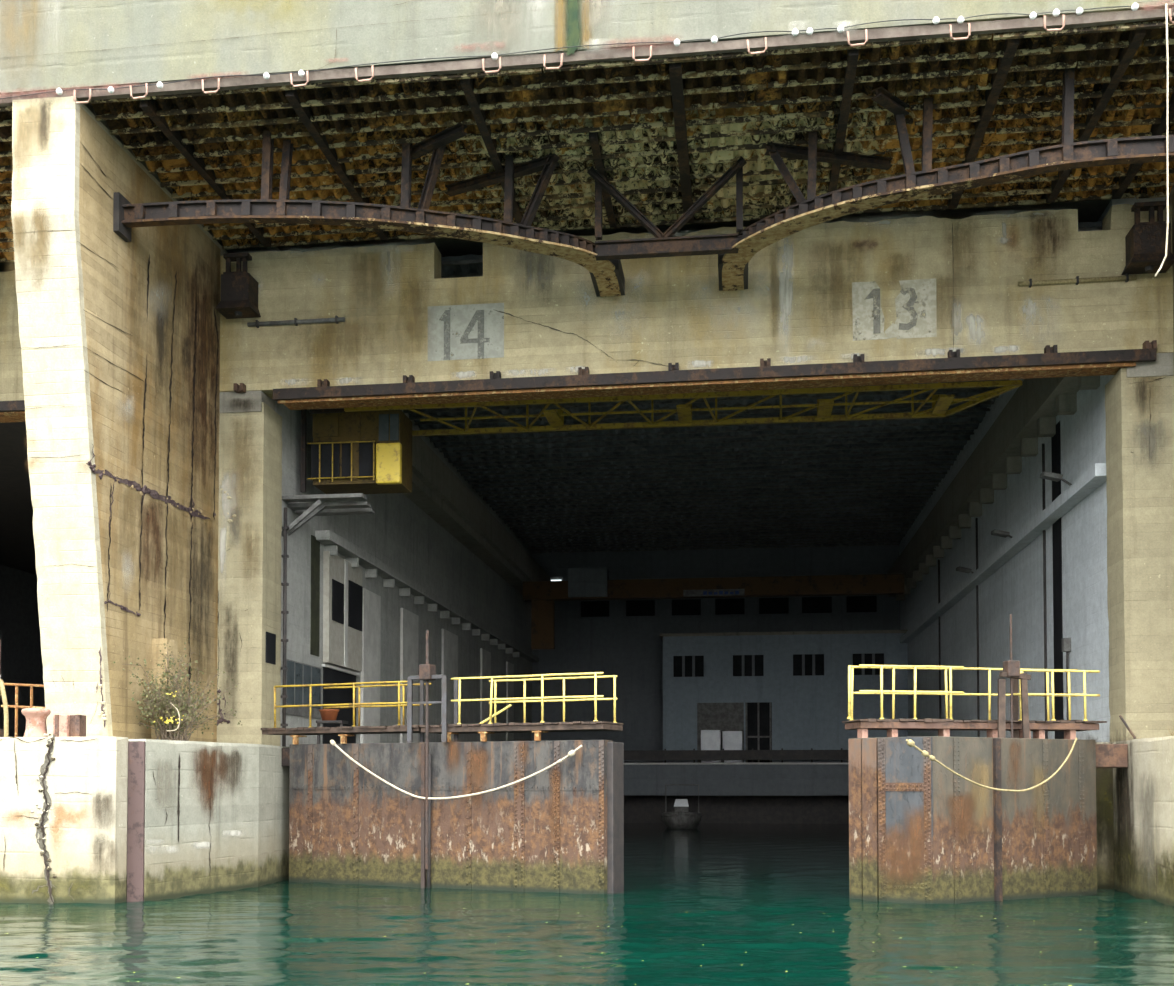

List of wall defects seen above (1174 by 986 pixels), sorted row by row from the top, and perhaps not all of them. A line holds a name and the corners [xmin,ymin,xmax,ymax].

leakage [157,312,165,370]
crack [495,310,665,366]
leakage [124,494,177,578]
leakage [191,534,210,647]
crack [1,703,98,904]
rust [200,749,227,808]